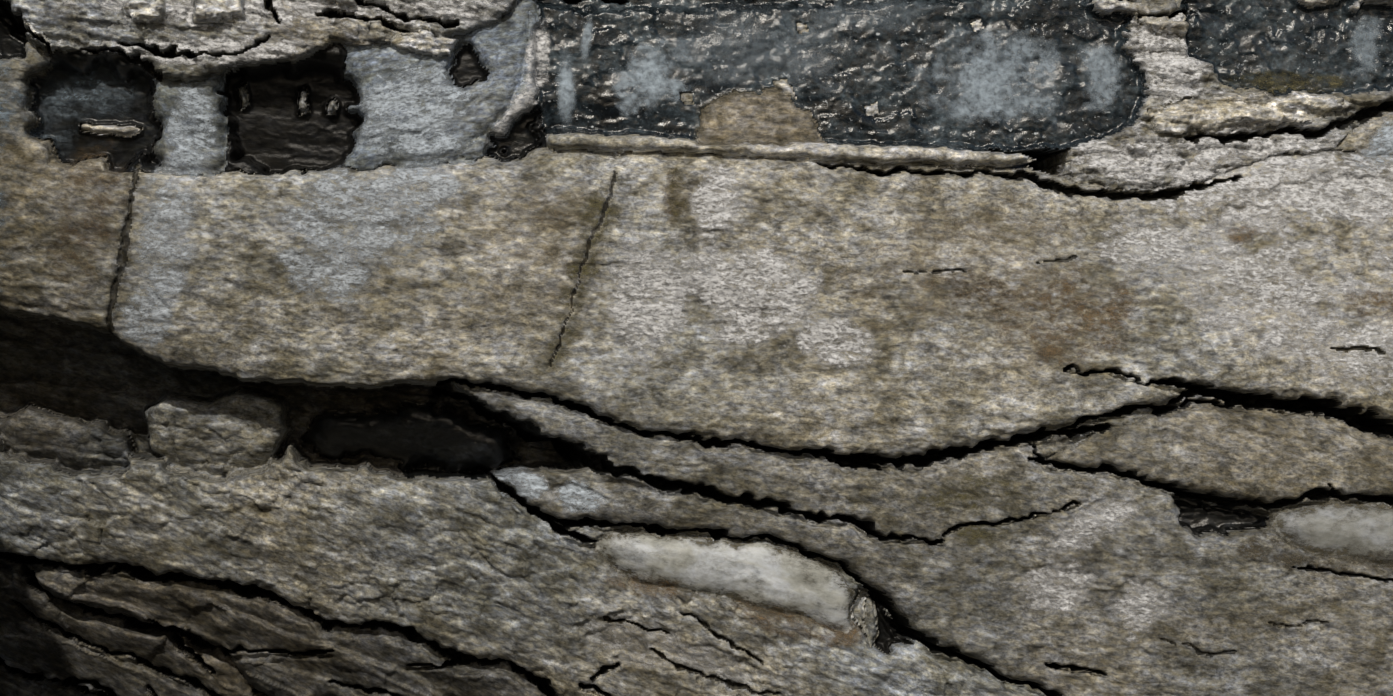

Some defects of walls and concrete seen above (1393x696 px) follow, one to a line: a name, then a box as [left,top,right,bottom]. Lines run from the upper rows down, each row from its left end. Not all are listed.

peeling [1087,0,1189,37]
peeling [1297,0,1393,13]
peeling [24,22,58,54]
peeling [385,30,459,59]
peeling [238,82,250,111]
peeling [299,89,339,116]
peeling [773,79,797,100]
peeling [864,102,878,116]
crack [106,163,142,337]
crack [432,171,1393,696]
crack [0,552,621,696]